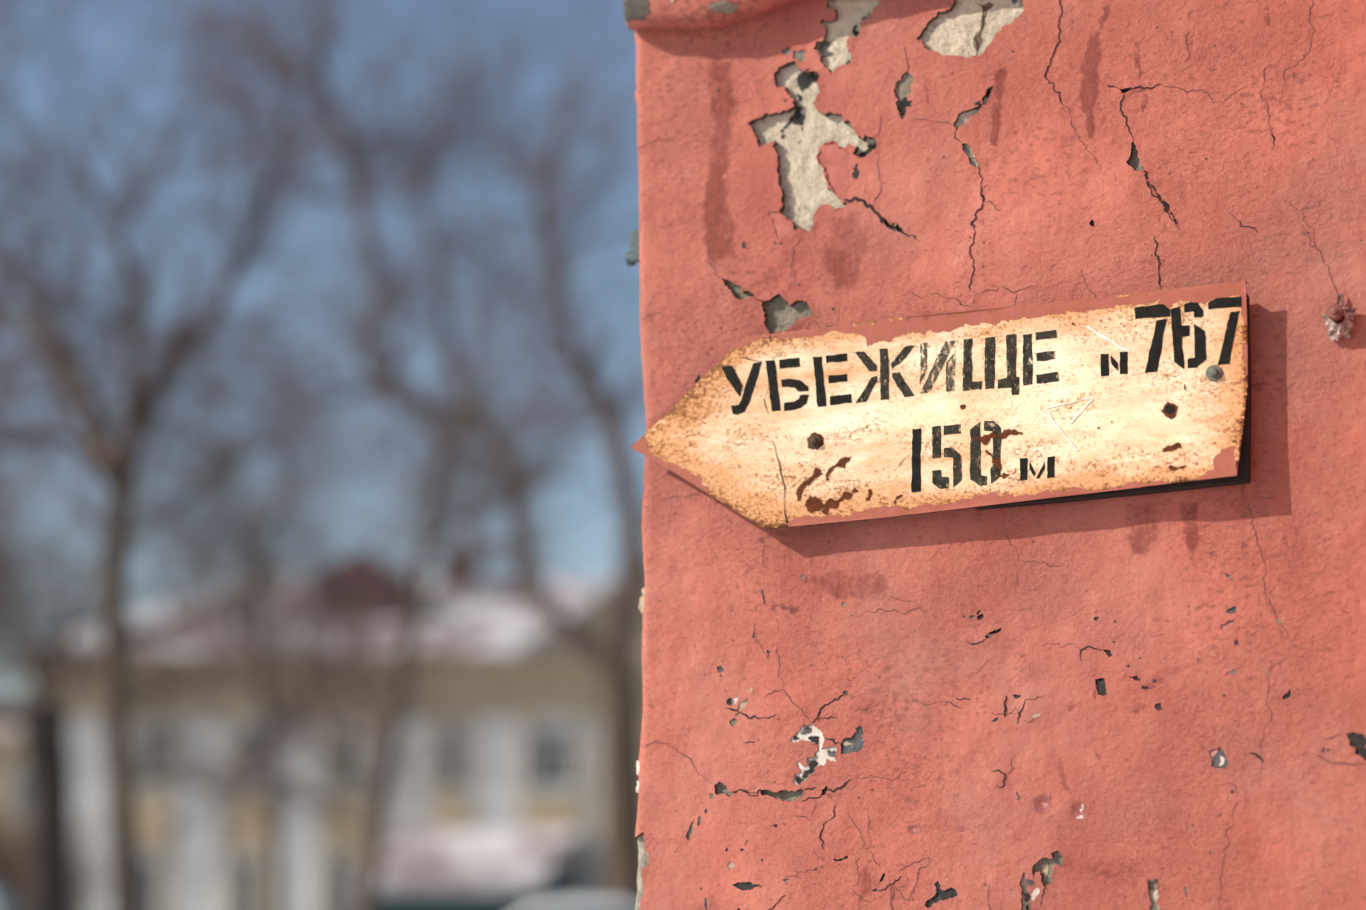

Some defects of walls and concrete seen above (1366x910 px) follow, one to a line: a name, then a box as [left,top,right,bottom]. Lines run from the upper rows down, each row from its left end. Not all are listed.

peeling [894,0,1024,119]
peeling [706,0,879,334]
crack [843,116,917,239]
crack [907,88,1096,306]
crack [1044,0,1315,288]
crack [753,540,811,722]
crack [908,629,1042,723]
crack [1040,643,1112,660]
peeling [686,688,870,840]
peeling [1300,732,1366,766]
crack [793,772,929,910]
peeling [1020,851,1063,910]